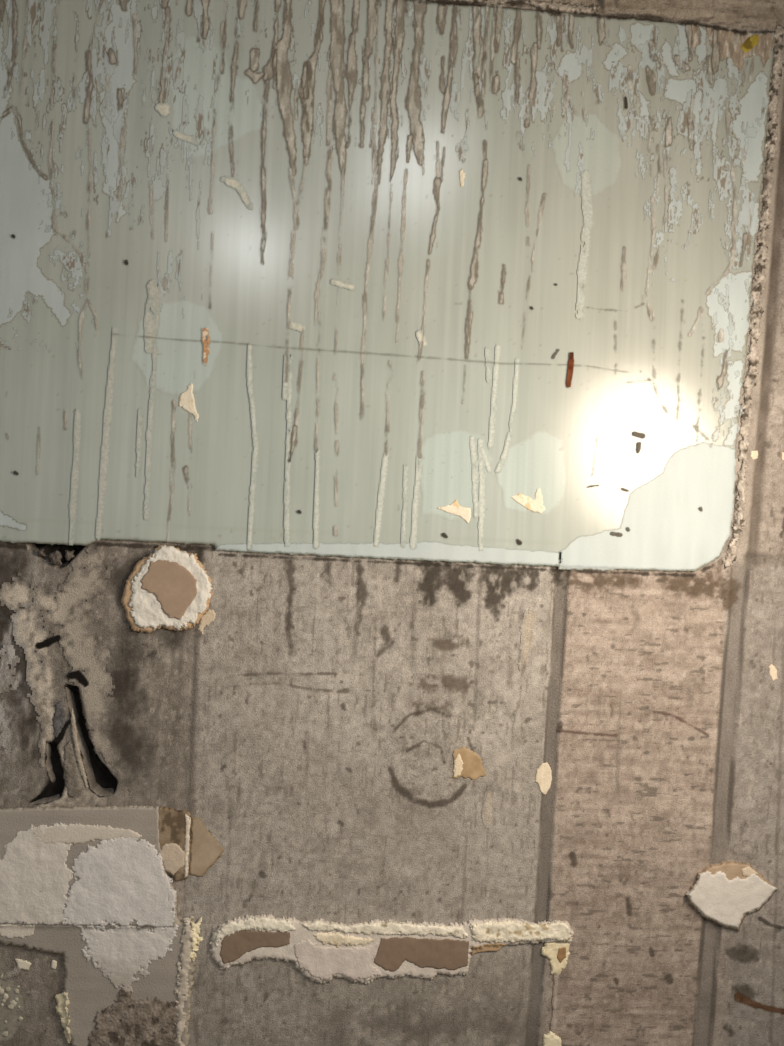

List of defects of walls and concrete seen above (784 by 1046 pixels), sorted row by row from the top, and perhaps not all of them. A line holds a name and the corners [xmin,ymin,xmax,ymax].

crack [419,0,772,35]
damp [155,0,458,550]
peeling [216,0,780,571]
rust [202,328,210,366]
rust [566,352,574,388]
damp [0,327,141,808]
damp [419,560,471,605]
damp [482,567,539,616]
crack [36,635,61,649]
spalling [198,610,216,634]
crack [31,670,117,805]
spalling [15,958,32,970]